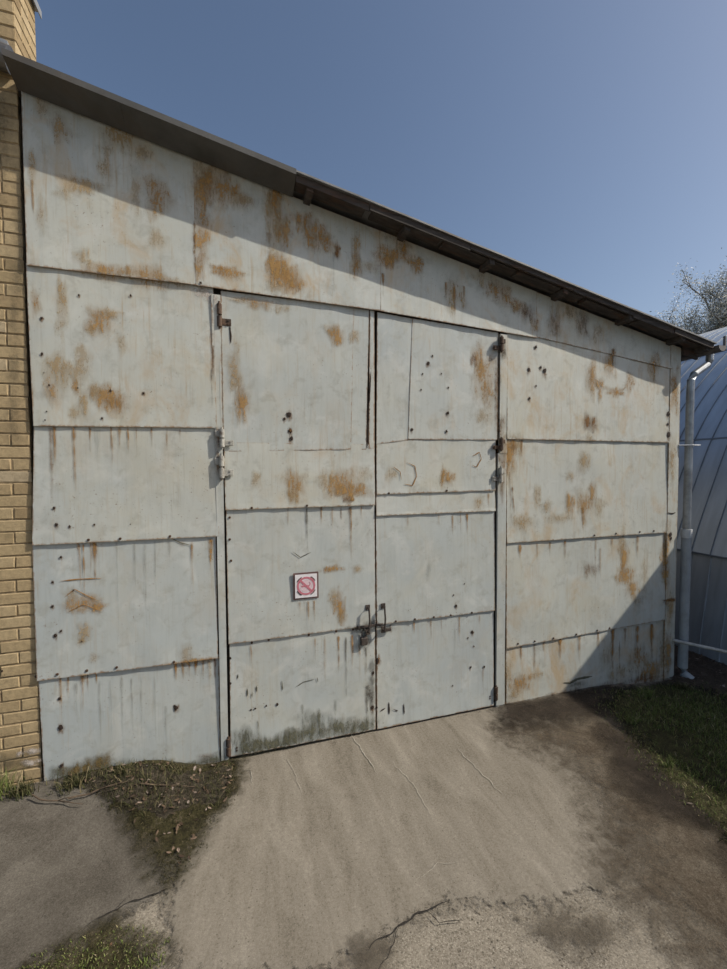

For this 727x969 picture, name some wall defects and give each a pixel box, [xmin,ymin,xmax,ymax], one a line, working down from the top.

rust [194,169,245,277]
rust [265,190,341,290]
rust [41,352,121,447]
rust [588,351,632,398]
rust [327,473,366,530]
rust [567,486,595,524]
rust [51,542,103,612]
rust [615,537,640,597]
rust [661,532,669,585]
leakage [239,687,377,756]
leakage [599,722,727,834]
crack [369,899,459,968]